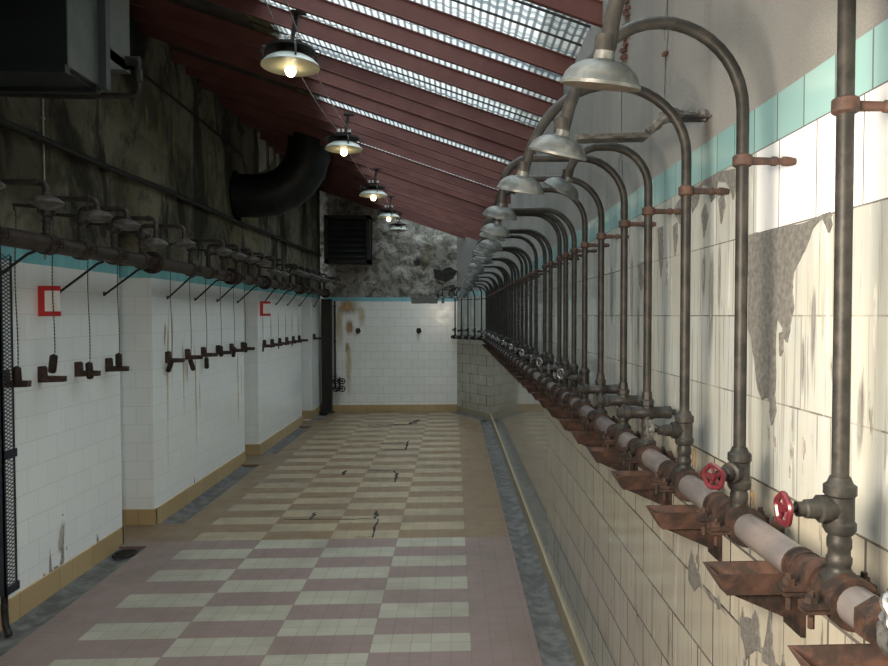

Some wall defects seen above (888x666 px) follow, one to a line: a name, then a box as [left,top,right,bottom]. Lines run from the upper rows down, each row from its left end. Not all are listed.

spalling [748,212,833,452]
peeling [789,437,806,478]
crack [283,512,321,520]
crack [347,511,379,538]
spalling [688,549,723,611]
spalling [740,607,786,666]